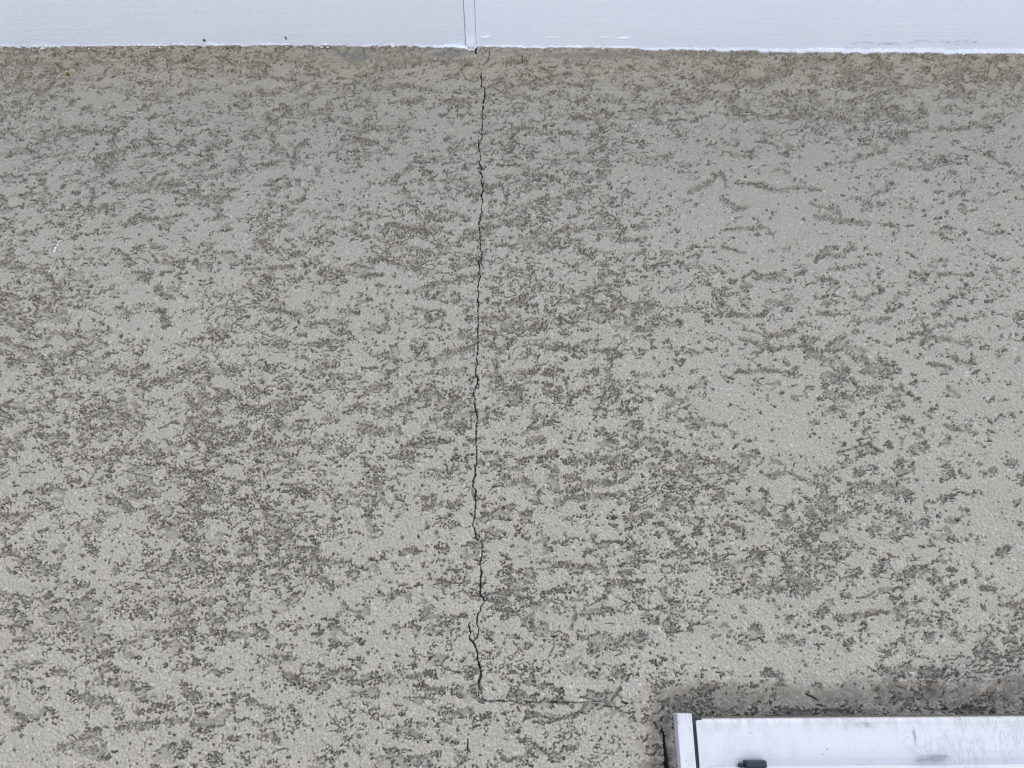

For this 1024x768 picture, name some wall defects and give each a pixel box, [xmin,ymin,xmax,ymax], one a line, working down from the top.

crack [468,47,673,728]